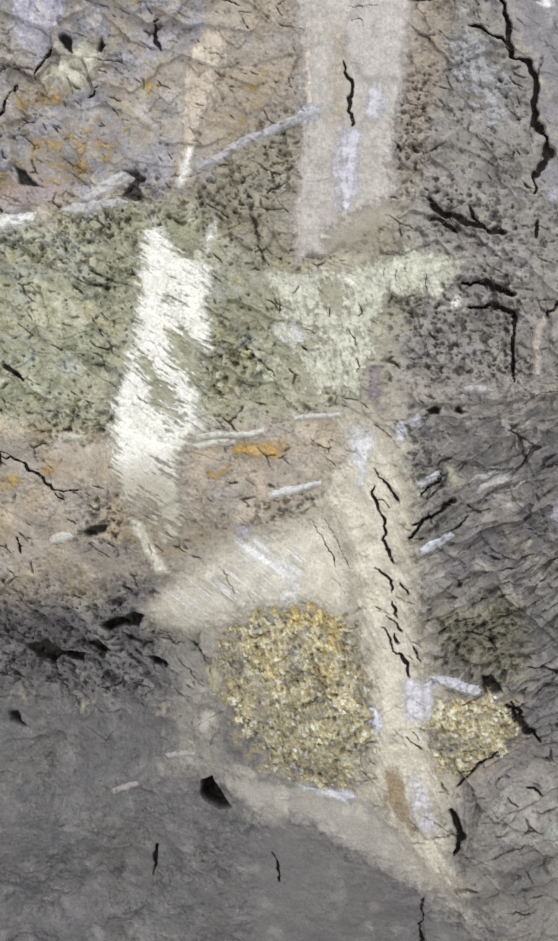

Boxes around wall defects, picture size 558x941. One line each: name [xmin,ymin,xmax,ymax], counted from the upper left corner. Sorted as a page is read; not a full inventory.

crack [153,20,162,51]
crack [0,49,52,116]
crack [343,62,355,126]
crack [470,0,554,194]
crack [428,198,505,235]
crack [462,278,518,382]
crack [0,452,79,500]
rust [233,440,286,459]
crack [314,520,350,590]
crack [371,472,468,676]